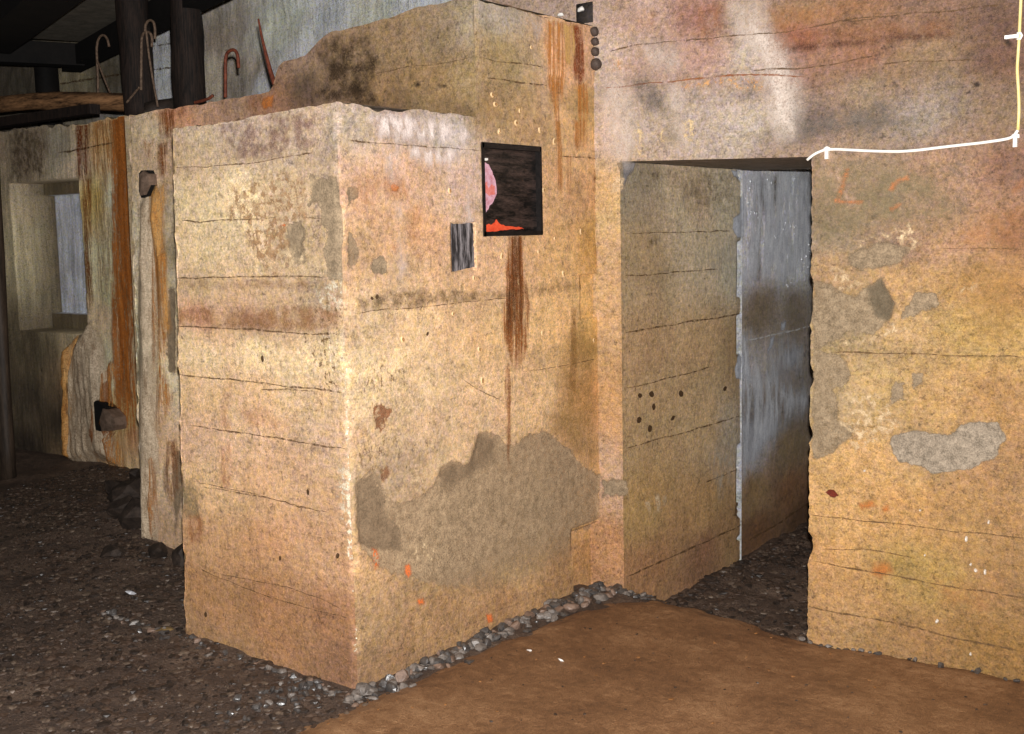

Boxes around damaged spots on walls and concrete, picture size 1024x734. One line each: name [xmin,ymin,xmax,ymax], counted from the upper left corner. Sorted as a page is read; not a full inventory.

rust [548,21,588,185]
rust [76,116,137,435]
rust [504,236,529,357]
spalling [812,225,1006,474]